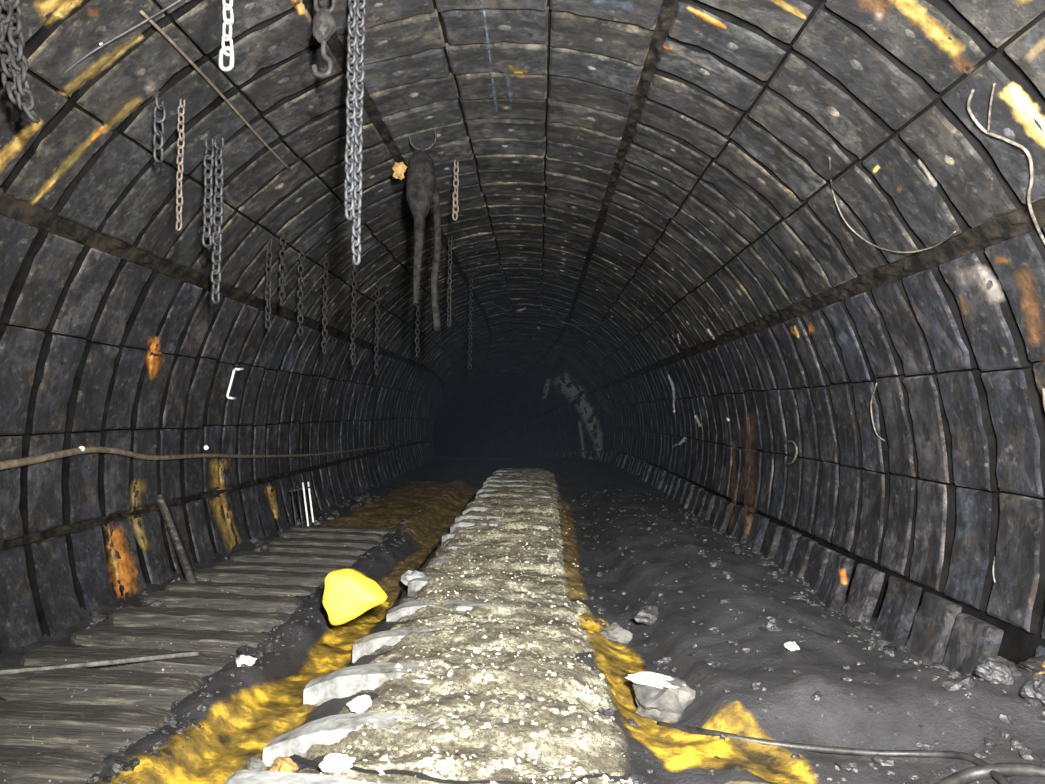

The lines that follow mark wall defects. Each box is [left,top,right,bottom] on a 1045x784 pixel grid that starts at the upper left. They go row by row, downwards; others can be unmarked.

corrosion [292,0,313,23]
corrosion [147,337,161,380]
corrosion [103,521,137,595]